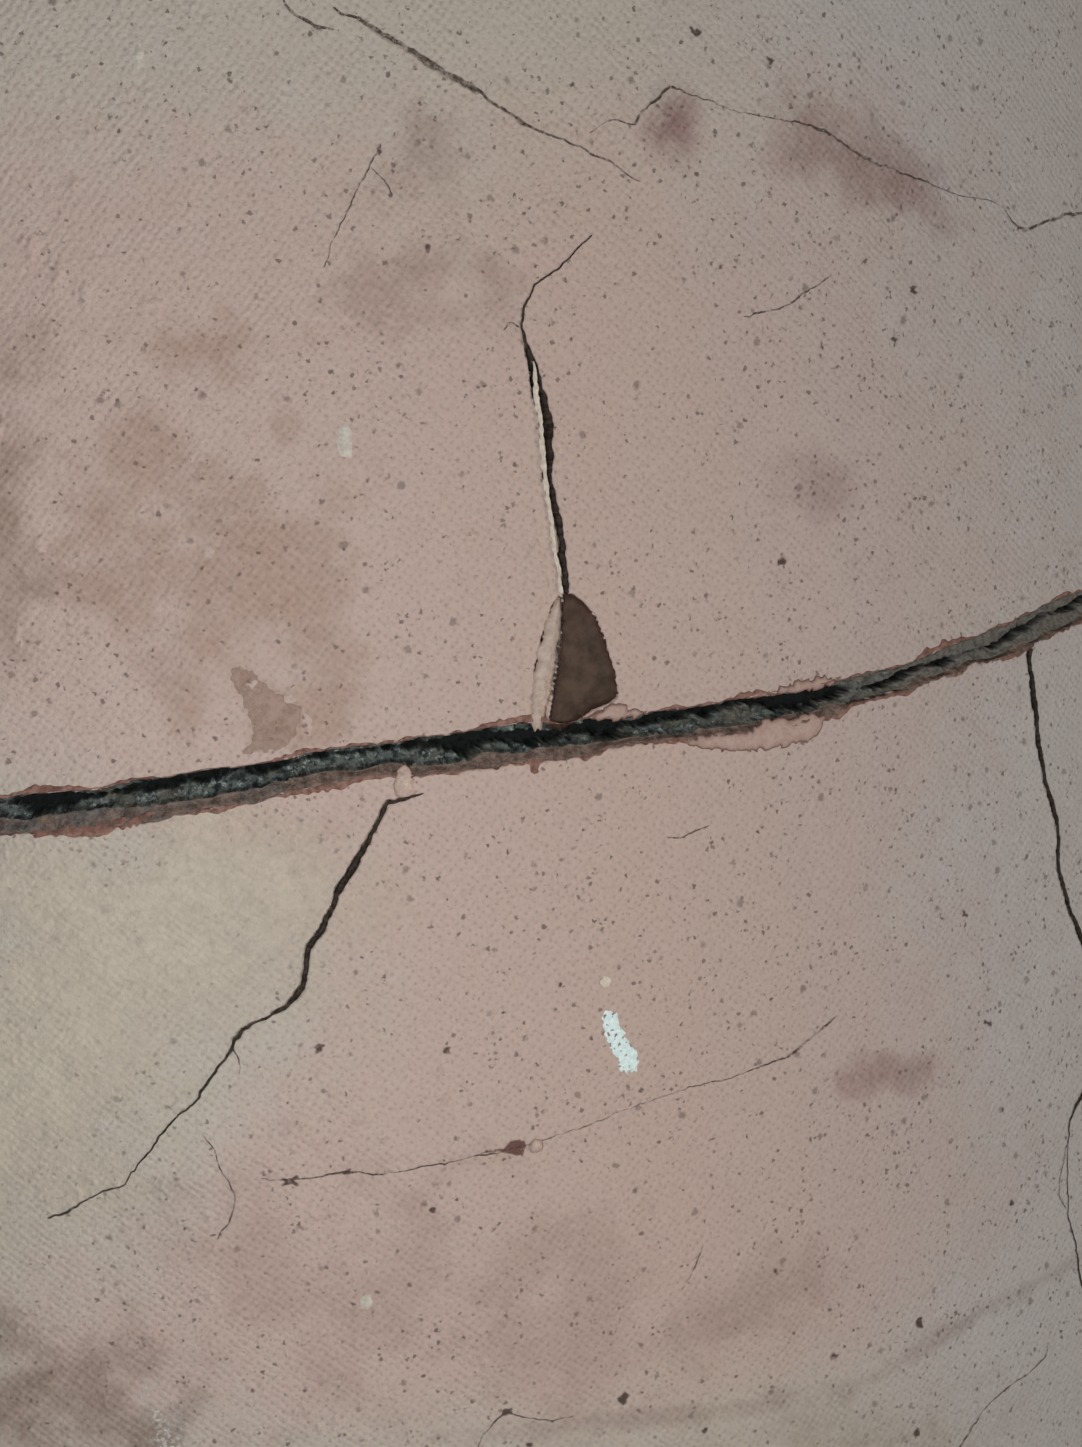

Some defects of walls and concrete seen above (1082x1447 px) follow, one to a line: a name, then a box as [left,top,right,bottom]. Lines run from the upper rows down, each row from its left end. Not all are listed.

crack [283,0,714,181]
crack [324,150,392,267]
crack [748,113,1082,230]
crack [503,235,592,595]
spalling [531,594,619,732]
crack [0,589,1082,1239]
crack [1058,1093,1082,1286]
crack [478,1413,573,1447]
crack [959,1343,1049,1447]